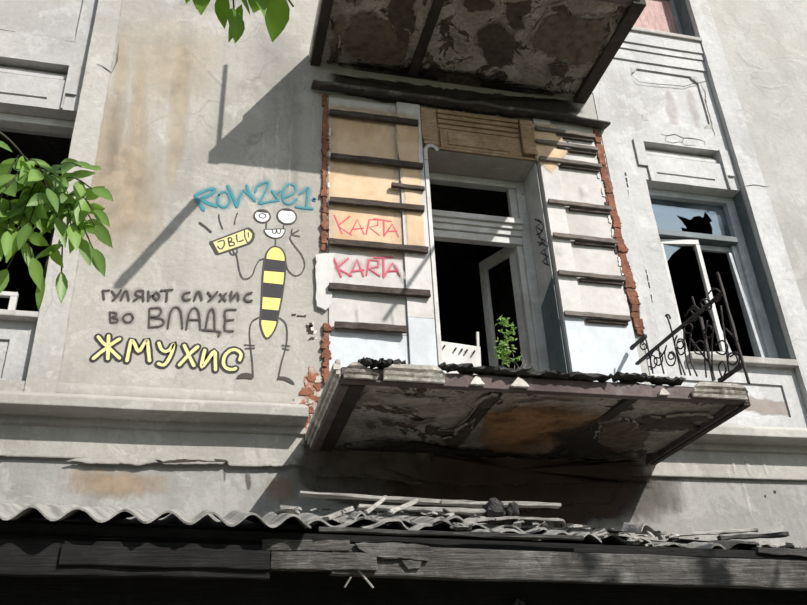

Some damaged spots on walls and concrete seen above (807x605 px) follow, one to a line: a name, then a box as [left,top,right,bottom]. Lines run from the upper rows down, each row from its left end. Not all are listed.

spalling [337,0,427,68]
spalling [464,0,497,14]
spalling [475,0,534,69]
spalling [547,62,569,78]
peeling [315,93,335,312]
spalling [589,127,645,336]
spalling [291,314,332,434]
water stain [380,394,432,405]
spalling [746,397,789,415]